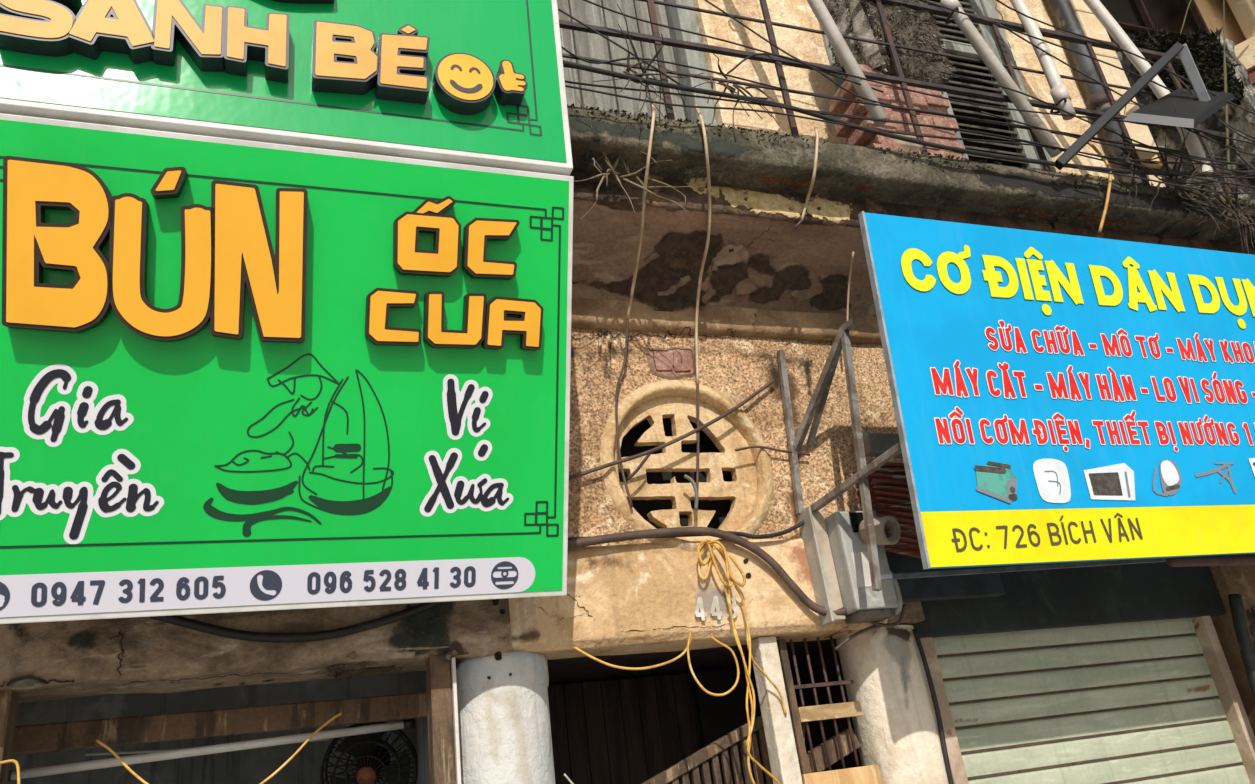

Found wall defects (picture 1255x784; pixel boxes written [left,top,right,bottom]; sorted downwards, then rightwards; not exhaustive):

water stain [568,116,745,192]
spalling [895,132,922,153]
peeling [684,173,852,226]
spalling [590,231,851,312]
spalling [646,347,696,380]
crack [109,630,282,685]
water stain [390,601,453,665]
crack [539,594,724,632]